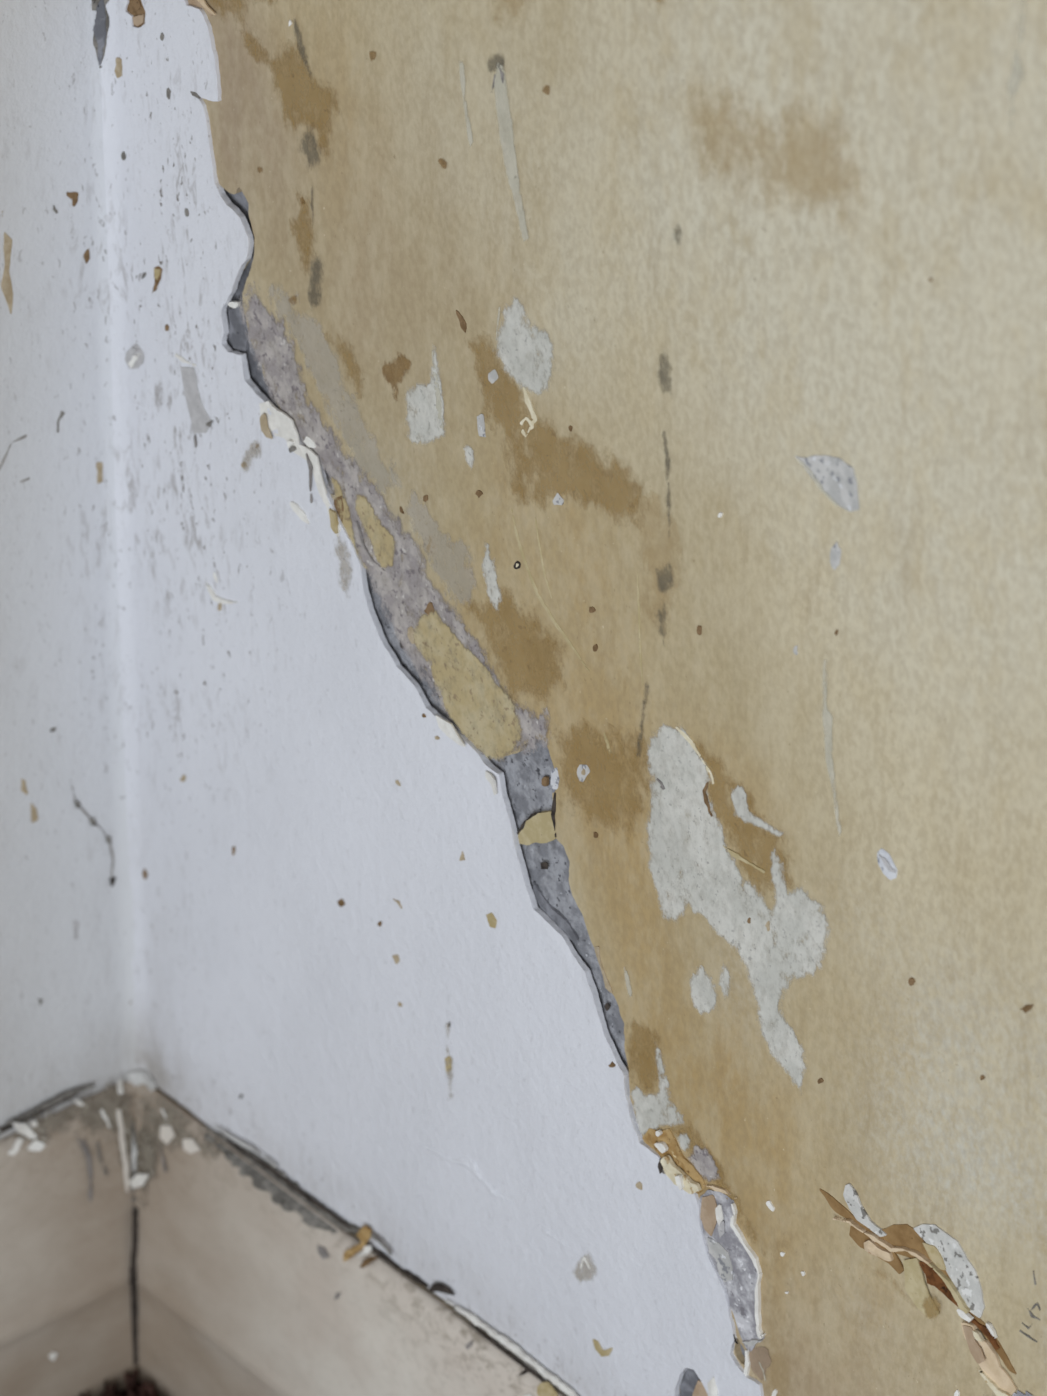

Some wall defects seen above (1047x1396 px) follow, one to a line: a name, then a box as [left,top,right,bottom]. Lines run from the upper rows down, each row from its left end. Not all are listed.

peeling [127,0,145,27]
leakage [246,23,336,163]
peeling [225,190,344,537]
flaking render [406,351,444,444]
flaking render [488,298,553,437]
leakage [472,342,641,514]
peeling [366,569,466,747]
leakage [564,725,649,823]
leakage [699,747,788,884]
peeling [485,739,629,1072]
flaking render [647,725,829,1088]
flaking render [631,1048,684,1134]